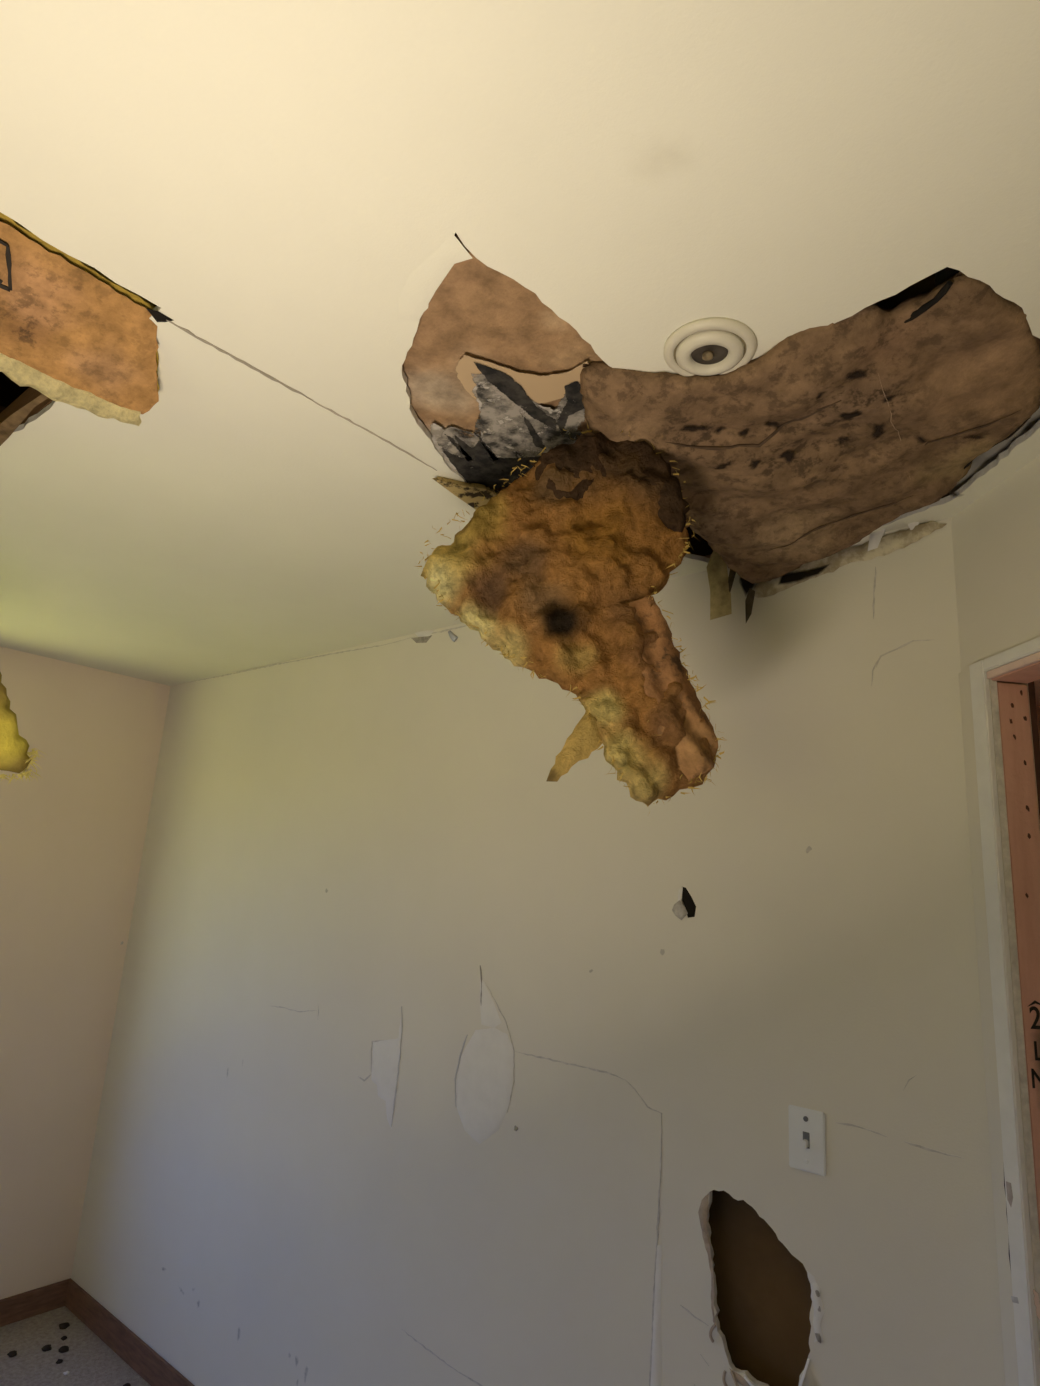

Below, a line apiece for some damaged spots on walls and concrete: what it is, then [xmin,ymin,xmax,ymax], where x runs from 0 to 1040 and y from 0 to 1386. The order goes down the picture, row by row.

peeling [398,233,603,510]
peeling [868,529,885,551]
spalling [672,887,696,920]
crack [518,1052,662,1386]
spalling [680,1193,754,1386]
spalling [807,1271,825,1343]